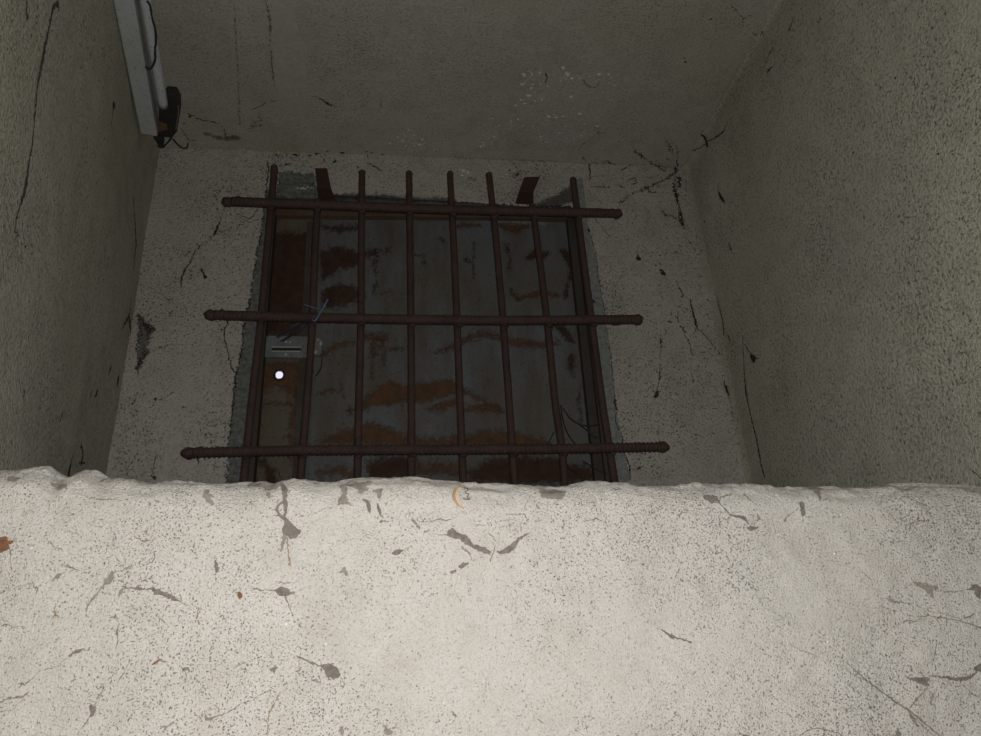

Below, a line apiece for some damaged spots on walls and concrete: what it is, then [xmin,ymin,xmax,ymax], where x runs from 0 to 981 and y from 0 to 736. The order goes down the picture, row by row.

crack [14,0,59,237]
crack [686,124,727,162]
rust [319,246,358,279]
rust [263,360,299,392]
rust [363,379,500,410]
crack [666,282,765,478]
rust [258,459,276,483]